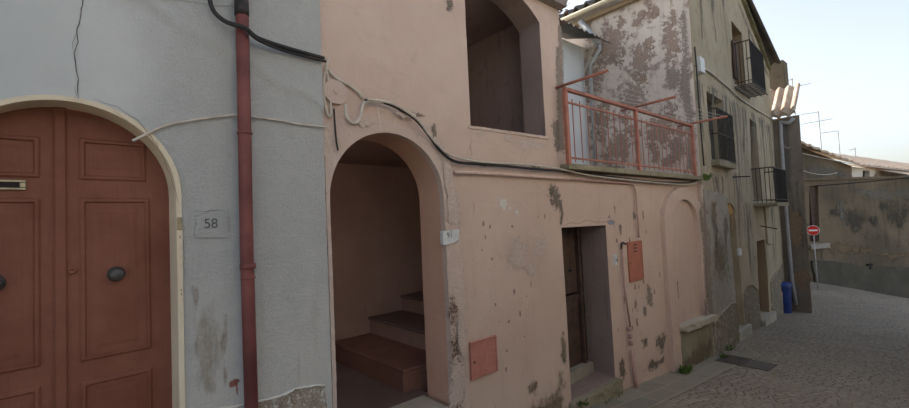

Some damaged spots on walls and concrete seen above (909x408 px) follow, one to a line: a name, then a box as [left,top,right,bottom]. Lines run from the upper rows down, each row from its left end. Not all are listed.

crack [72,0,230,274]
water stain [549,185,563,225]
peeling [551,25,565,153]
flaking render [584,2,697,171]
flaking render [699,202,812,354]
flaking render [258,384,327,408]